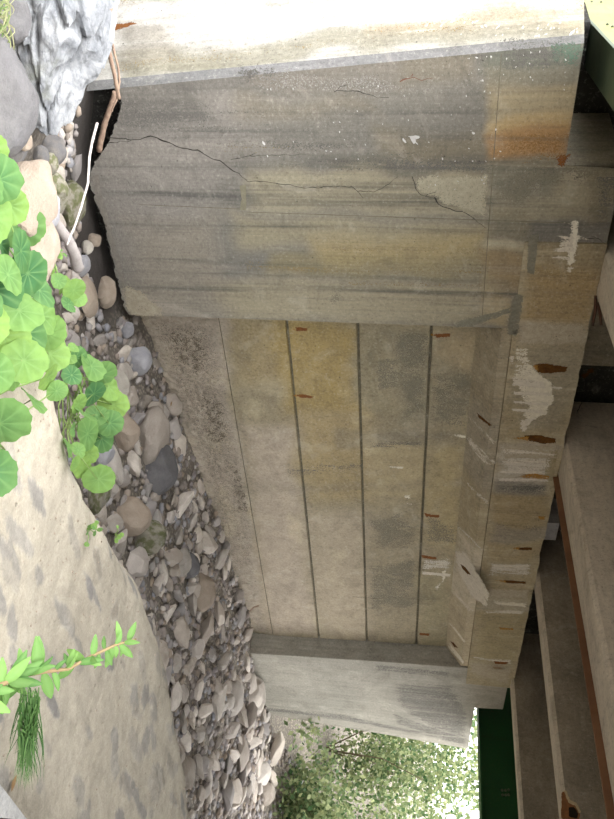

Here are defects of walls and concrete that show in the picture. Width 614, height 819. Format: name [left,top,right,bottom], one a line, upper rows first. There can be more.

crack [107,136,484,227]
spalling [416,174,490,216]
damp [535,236,598,281]
corrosion [533,363,567,374]
corrosion [517,435,556,444]